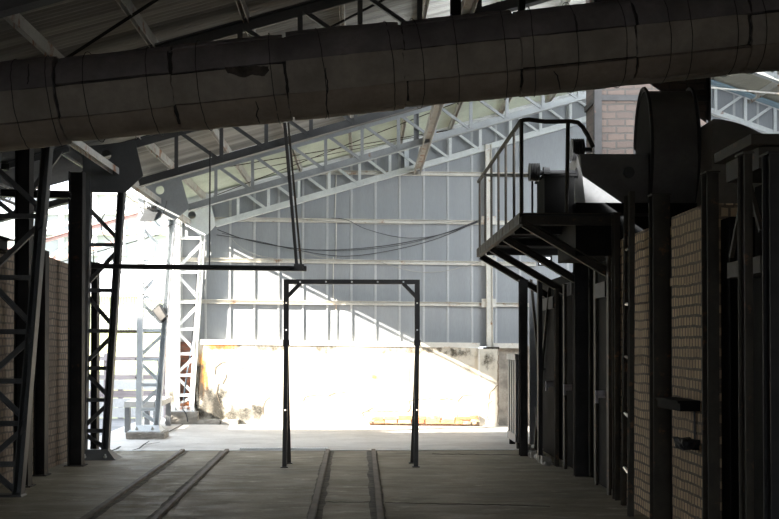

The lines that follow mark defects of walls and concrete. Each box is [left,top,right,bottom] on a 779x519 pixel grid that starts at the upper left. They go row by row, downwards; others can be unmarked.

rust [207,344,237,357]
rust [199,355,208,388]
water stain [195,365,263,422]